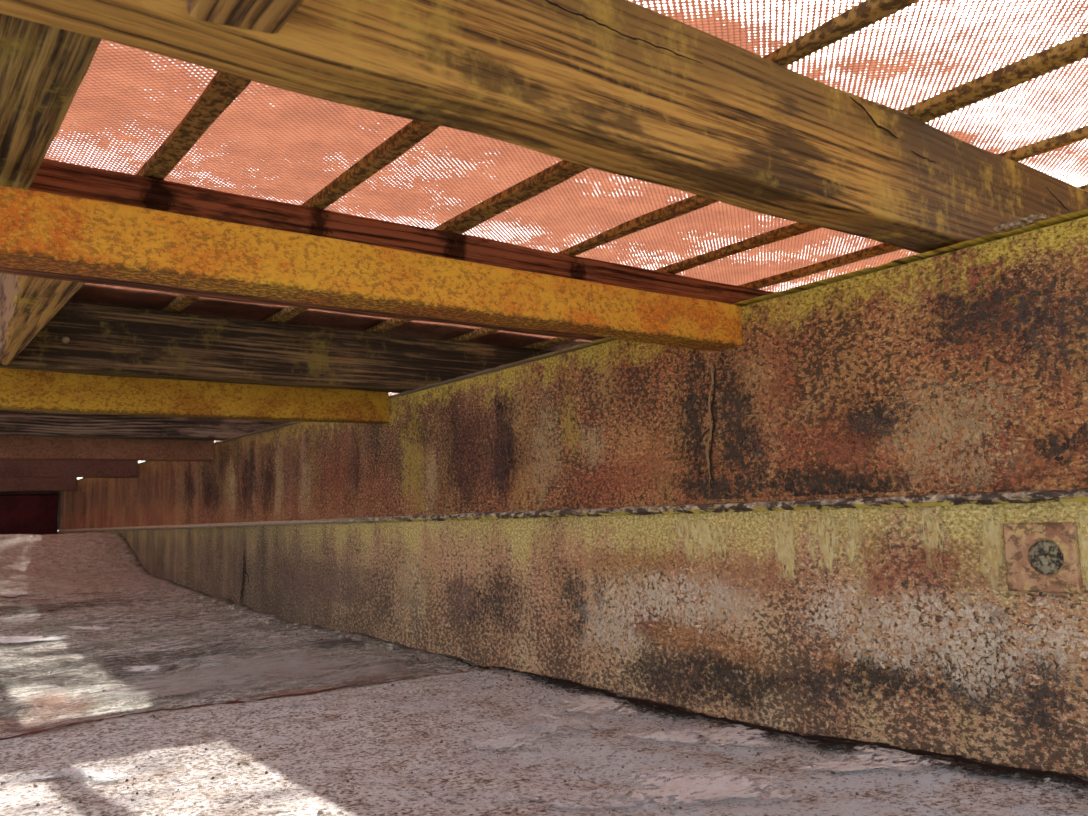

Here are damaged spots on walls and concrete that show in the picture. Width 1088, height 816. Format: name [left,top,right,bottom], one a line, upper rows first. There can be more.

crack [693,363,716,489]
water stain [471,696,638,750]
water stain [626,724,775,747]
water stain [626,604,1079,738]